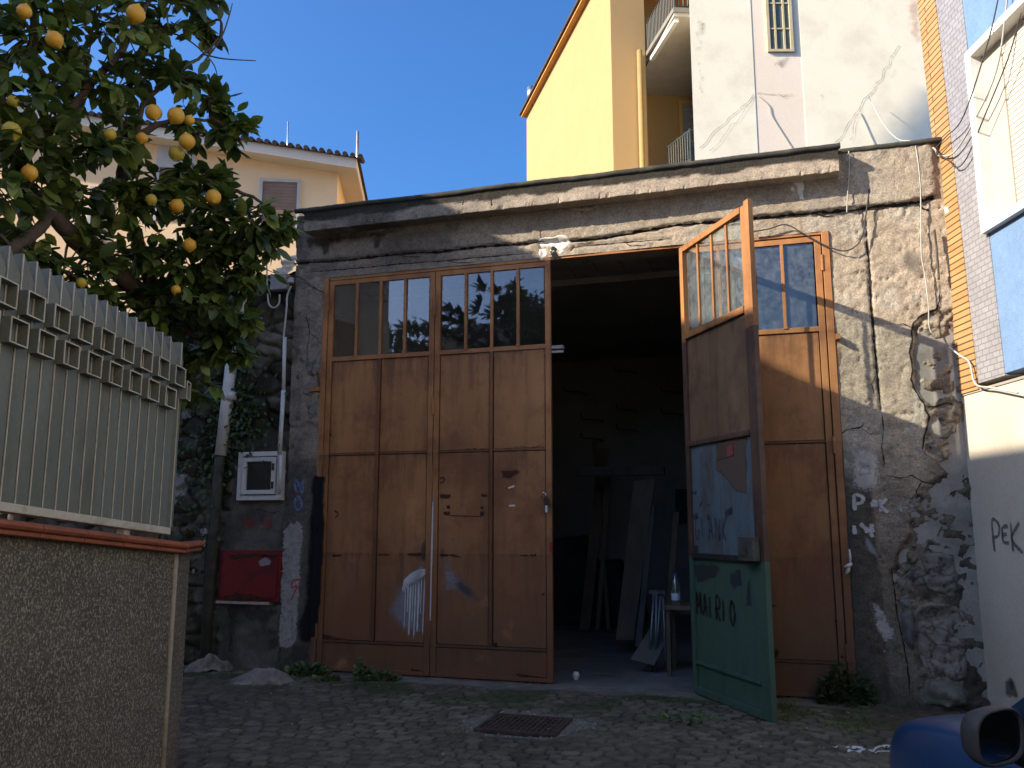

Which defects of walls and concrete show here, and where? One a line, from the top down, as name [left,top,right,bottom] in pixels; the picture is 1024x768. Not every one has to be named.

crack [699,93,786,150]
crack [836,46,899,142]
peeling [917,315,948,365]
crack [891,567,913,694]